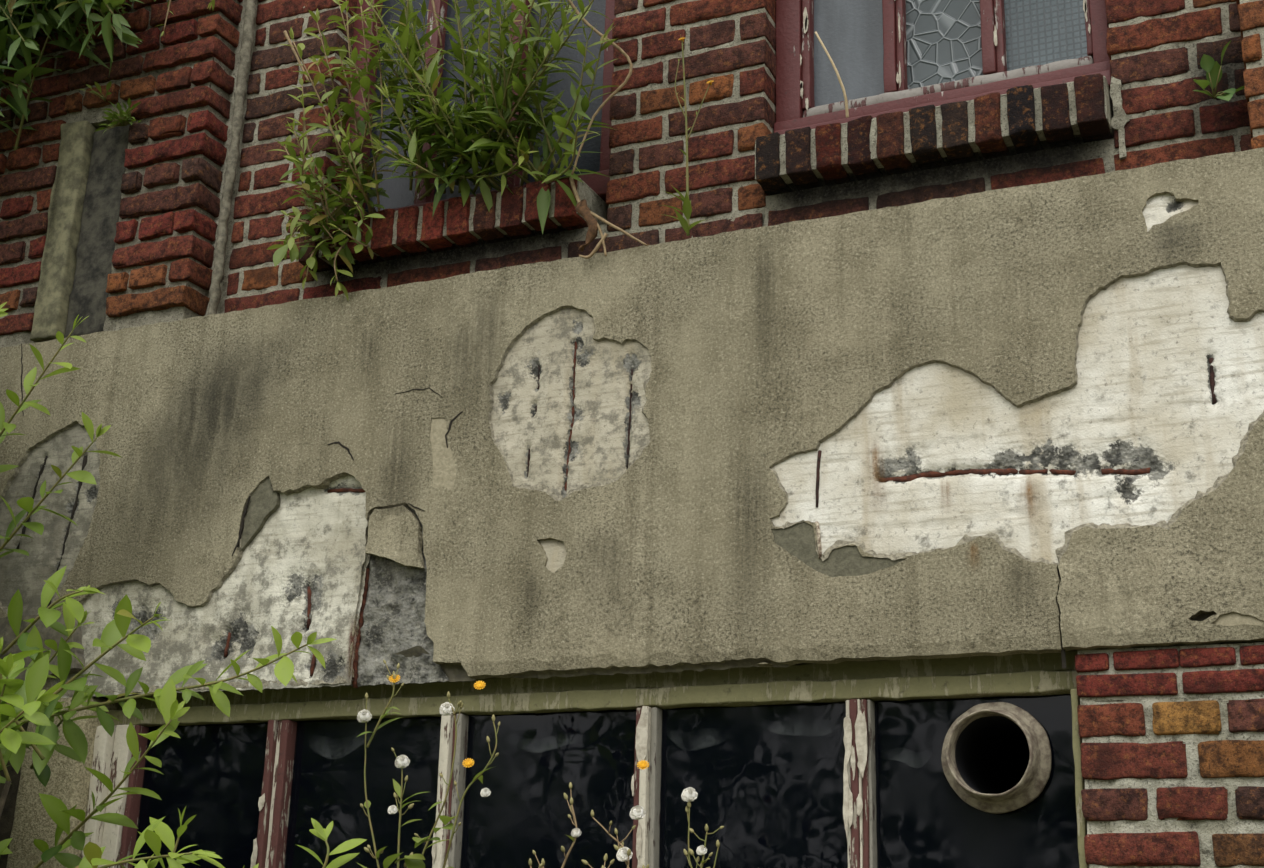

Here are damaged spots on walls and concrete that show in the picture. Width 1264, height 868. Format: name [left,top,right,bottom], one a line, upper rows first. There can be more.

spalling [1142,193,1198,231]
spalling [488,305,652,501]
spalling [769,262,1264,577]
spalling [50,473,476,698]
spalling [539,539,567,573]
crack [1057,569,1066,668]